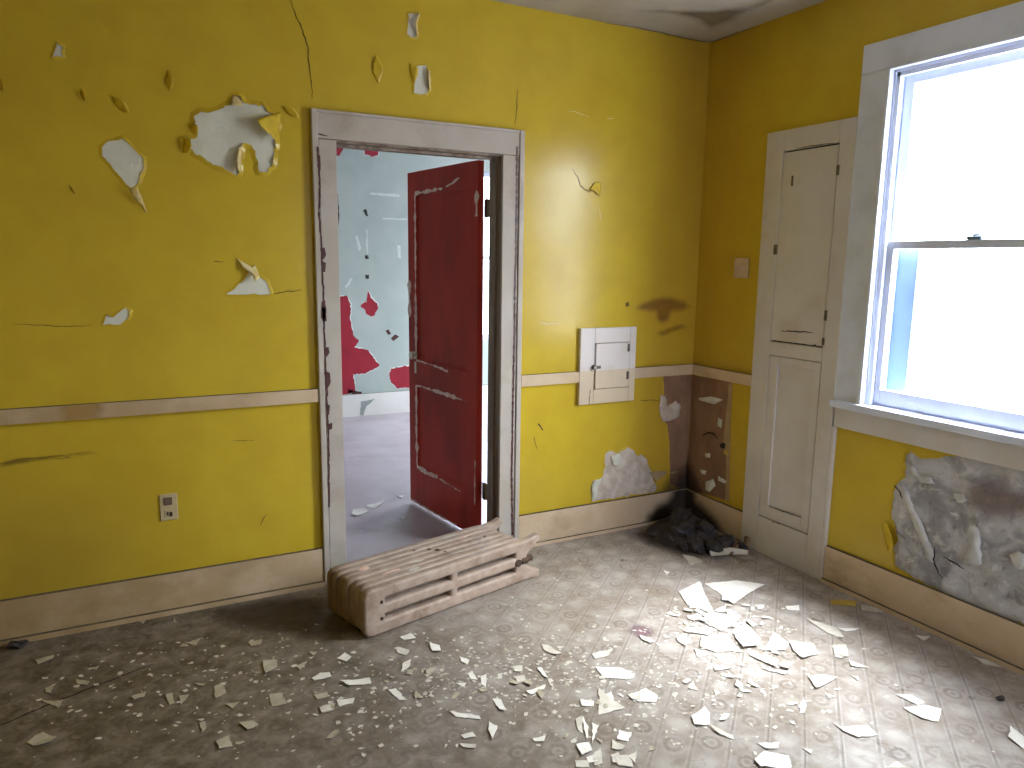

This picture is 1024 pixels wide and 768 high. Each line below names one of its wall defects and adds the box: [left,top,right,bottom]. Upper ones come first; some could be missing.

crack [291,1,313,94]
peeling [405,11,420,40]
peeling [409,63,431,96]
peeling [99,135,147,213]
peeling [179,91,282,180]
crack [573,170,601,218]
peeling [100,305,133,327]
peeling [224,258,301,298]
flaking render [589,374,732,503]
flaking render [881,449,1024,625]